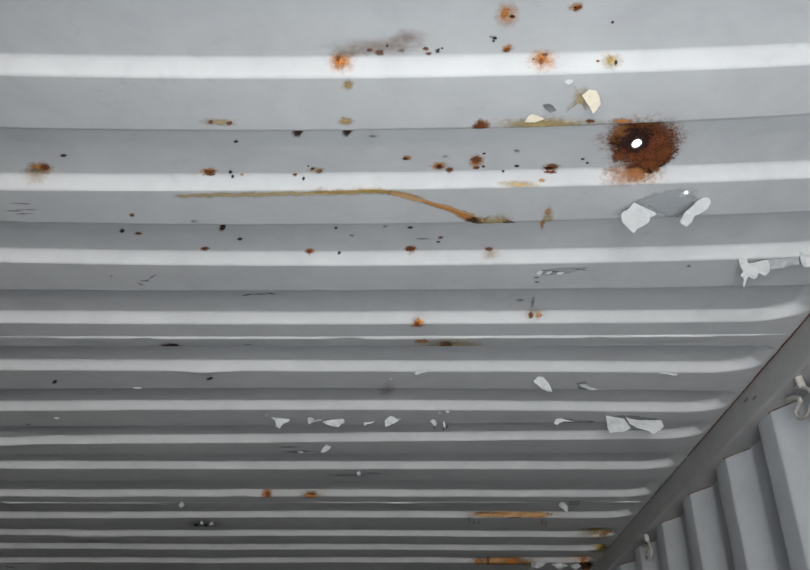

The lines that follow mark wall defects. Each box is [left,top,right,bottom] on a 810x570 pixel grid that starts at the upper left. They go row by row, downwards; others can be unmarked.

corrosion [533,52,552,66]
peeling [575,90,601,114]
corrosion [521,119,595,127]
corrosion [30,163,49,173]
corrosion [178,190,515,224]
peeling [621,189,711,233]
peeling [739,251,810,287]
peeling [533,377,553,392]
peeling [307,417,344,427]
peeling [606,416,664,435]
corrosion [579,313,810,570]
corrosion [466,511,548,526]